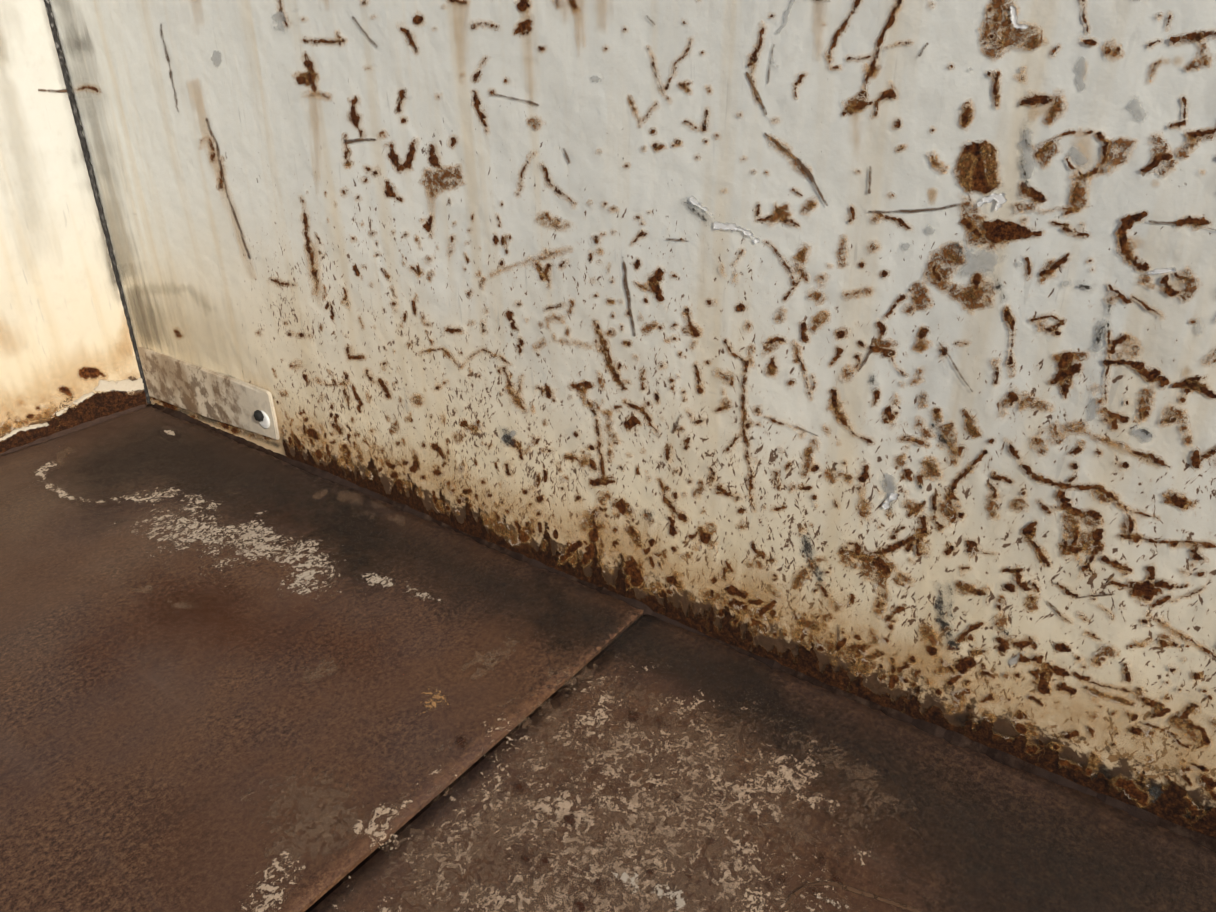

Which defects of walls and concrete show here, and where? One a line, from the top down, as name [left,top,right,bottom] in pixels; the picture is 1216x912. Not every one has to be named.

rust [514,0,532,35]
rust [980,0,1047,77]
rust [1169,30,1216,71]
rust [842,84,897,116]
rust [344,131,463,205]
rust [1140,132,1200,177]
rust [756,188,816,227]
rust [351,223,462,356]
rust [594,268,699,358]
rust [855,91,1136,415]
rust [1118,211,1198,303]
damp [83,430,536,607]